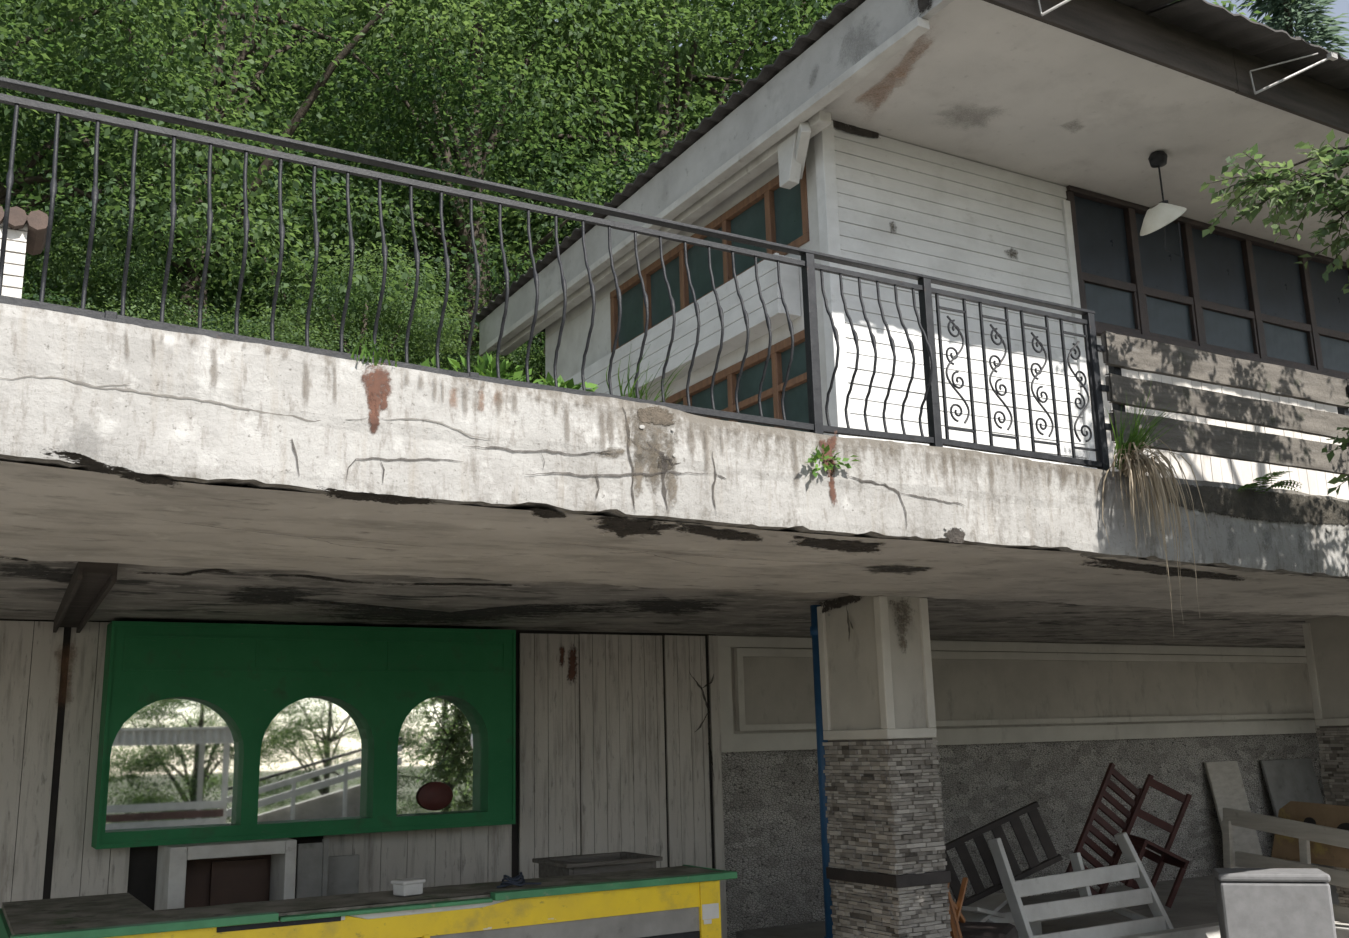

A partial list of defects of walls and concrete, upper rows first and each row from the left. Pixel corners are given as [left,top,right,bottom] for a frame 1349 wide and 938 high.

rust [362,365,391,433]
crack [2,375,726,514]
leakage [600,408,678,502]
crack [847,475,965,530]
spalling [586,517,763,544]
spalling [788,537,884,556]
spalling [1082,556,1245,581]
rust [559,644,578,683]